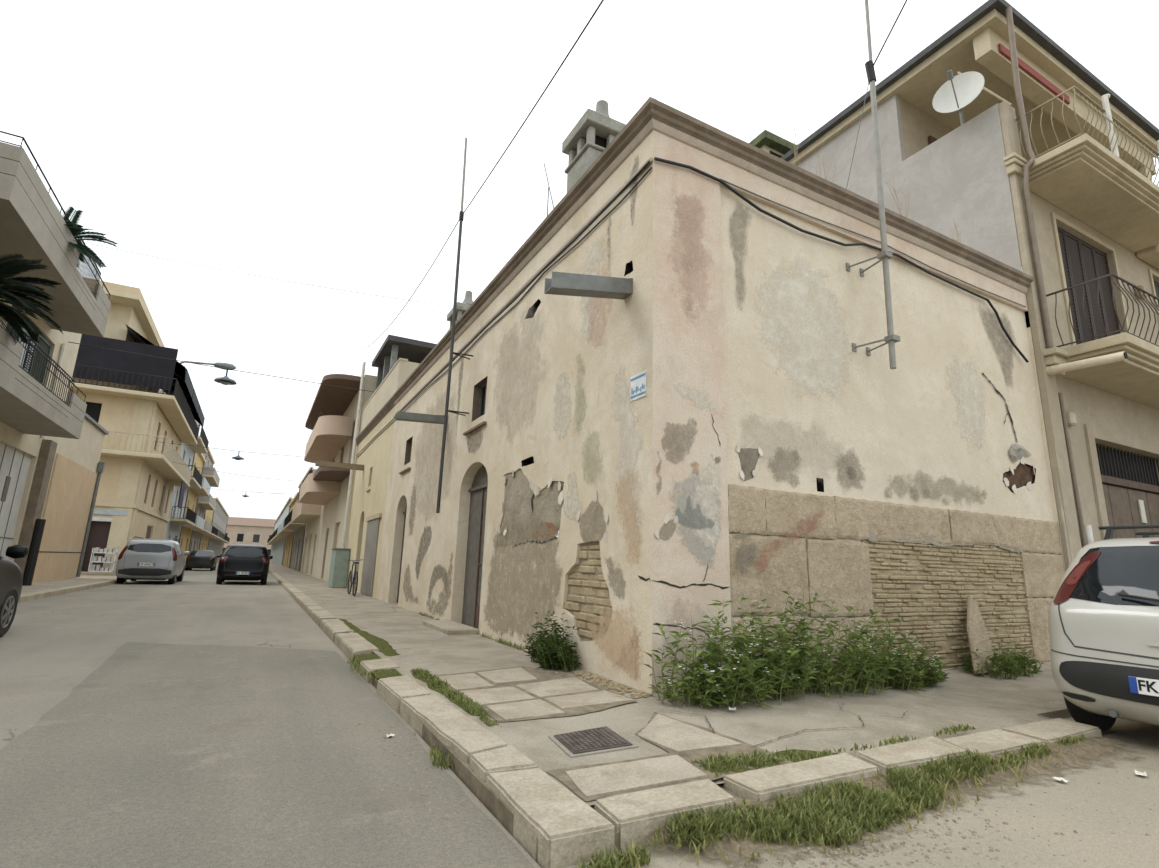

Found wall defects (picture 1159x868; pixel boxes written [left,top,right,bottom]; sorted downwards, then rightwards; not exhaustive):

spalling [498,459,564,547]
spalling [564,474,639,641]
spalling [654,514,678,540]
peeling [657,420,696,492]
crack [638,566,729,589]
peeling [692,452,721,547]
peeling [736,443,763,481]
spalling [1003,457,1035,493]